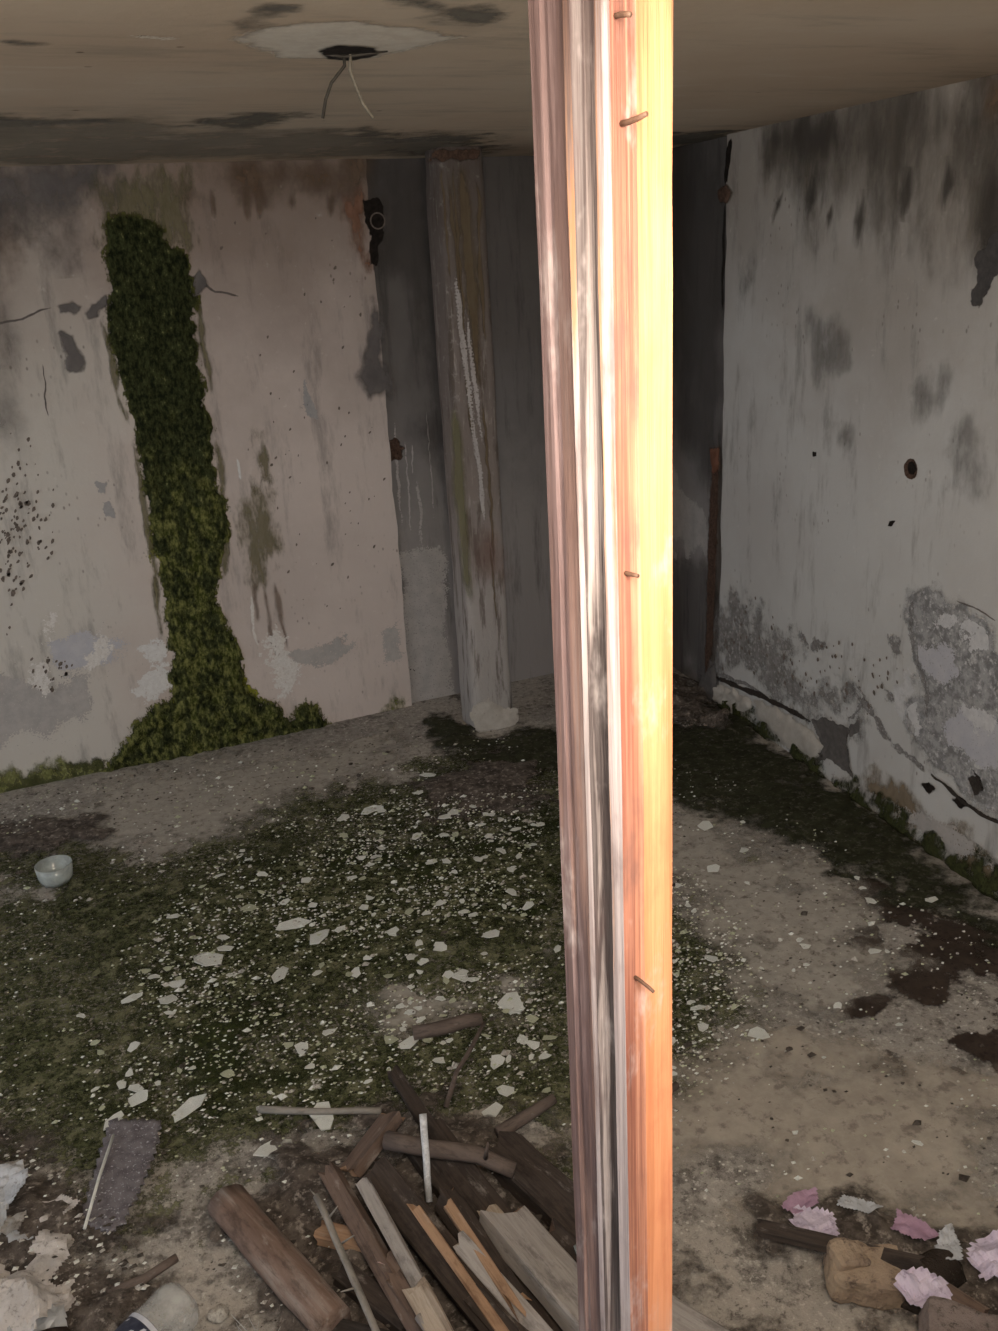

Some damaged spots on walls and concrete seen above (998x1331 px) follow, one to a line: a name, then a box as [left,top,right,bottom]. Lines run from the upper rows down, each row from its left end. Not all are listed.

leakage [198,113,309,128]
peeling [971,232,998,306]
leakage [0,437,55,606]
peeling [45,629,131,681]
crack [716,673,810,722]
spalling [893,587,998,812]
crack [849,687,998,824]